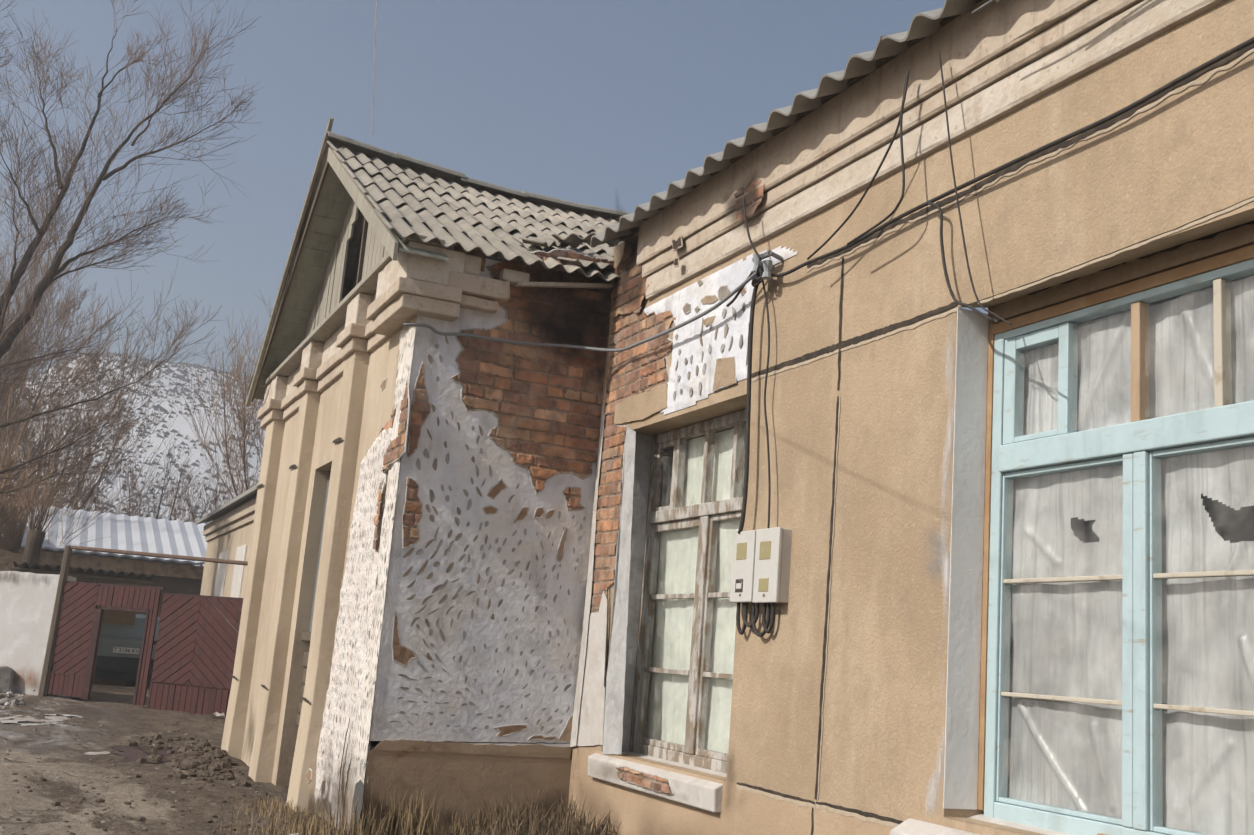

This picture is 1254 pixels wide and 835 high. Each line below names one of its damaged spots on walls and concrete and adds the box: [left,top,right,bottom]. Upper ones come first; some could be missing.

spalling [671,235,683,268]
peeling [373,361,431,549]
peeling [451,242,747,613]
spalling [392,610,418,667]
flaking render [616,765,674,795]